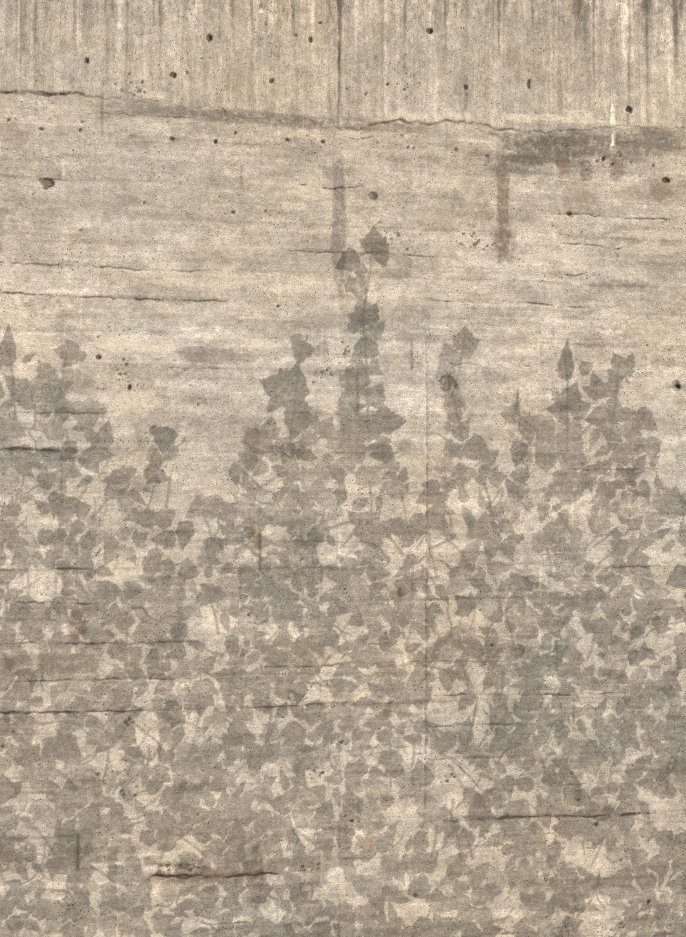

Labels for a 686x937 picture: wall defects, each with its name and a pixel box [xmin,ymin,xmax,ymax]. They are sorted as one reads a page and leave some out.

rust [498,164,510,256]